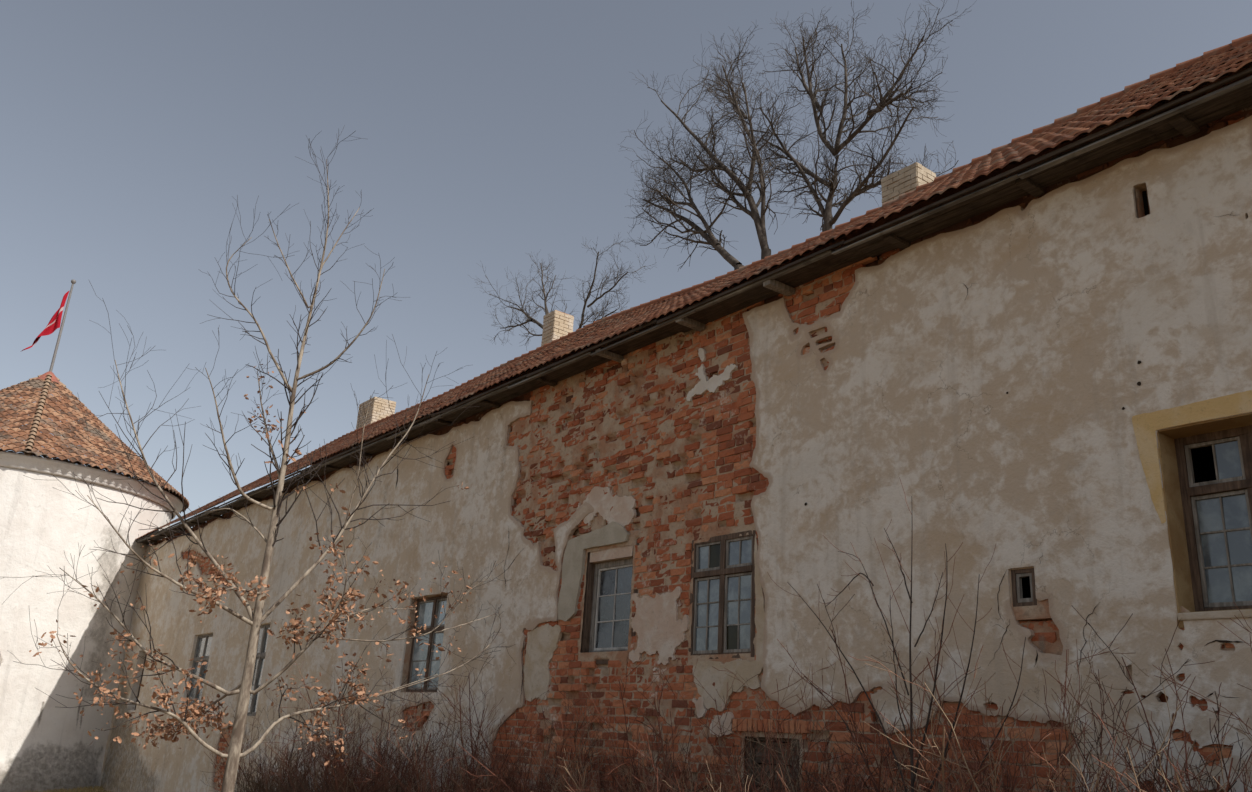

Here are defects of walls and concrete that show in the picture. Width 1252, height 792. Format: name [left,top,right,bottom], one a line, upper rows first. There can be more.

flaking render [445,446,456,479]
flaking render [491,248,1077,792]
flaking render [403,702,434,732]
flaking render [214,726,233,792]